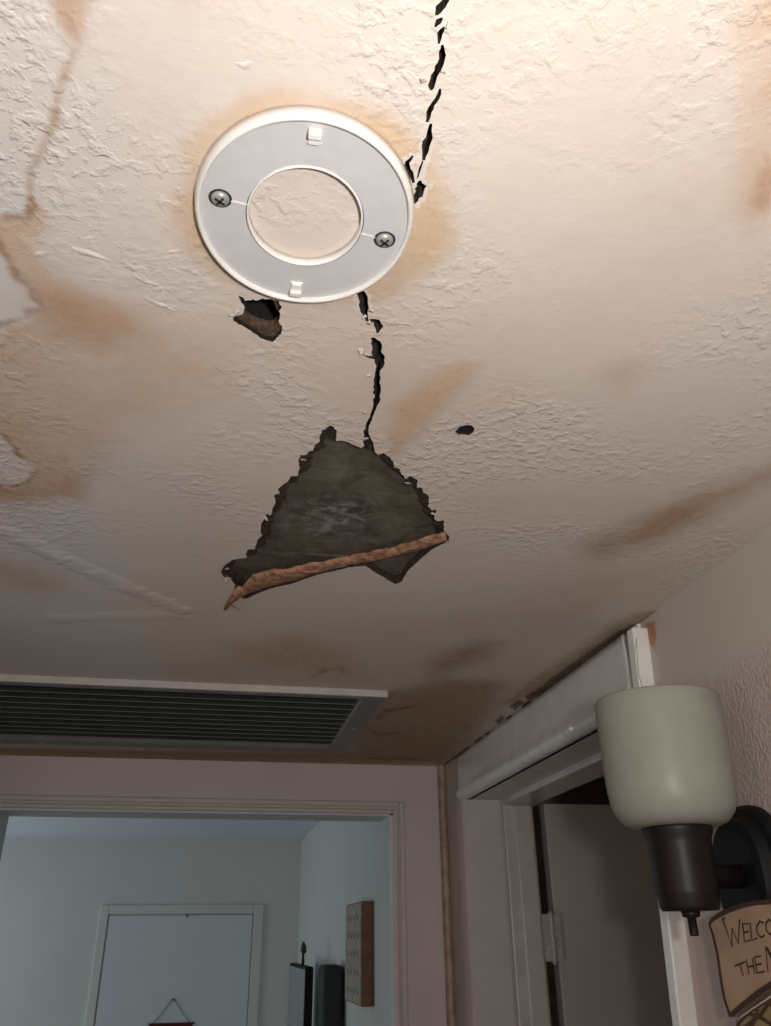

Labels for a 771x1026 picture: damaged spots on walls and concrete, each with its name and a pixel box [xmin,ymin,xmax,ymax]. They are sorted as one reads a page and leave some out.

crack [405,0,453,204]
spalling [229,296,282,342]
crack [357,291,385,448]
spalling [221,426,449,611]